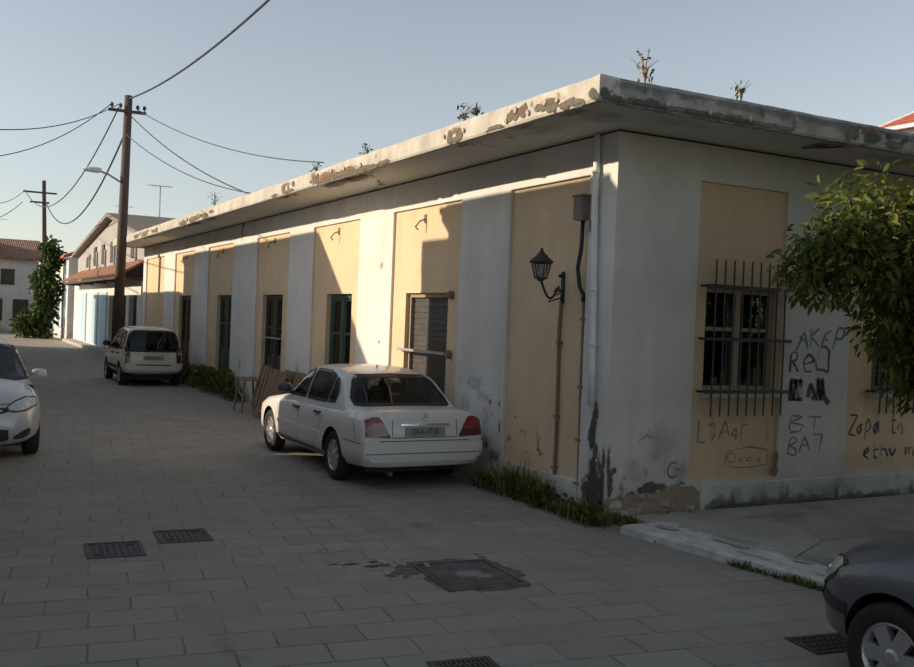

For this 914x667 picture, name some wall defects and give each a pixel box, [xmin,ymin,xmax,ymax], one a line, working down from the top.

damp [621,80,703,104]
spalling [442,128,475,146]
spalling [486,87,794,138]
damp [717,99,912,144]
spalling [309,155,390,188]
spalling [271,181,296,200]